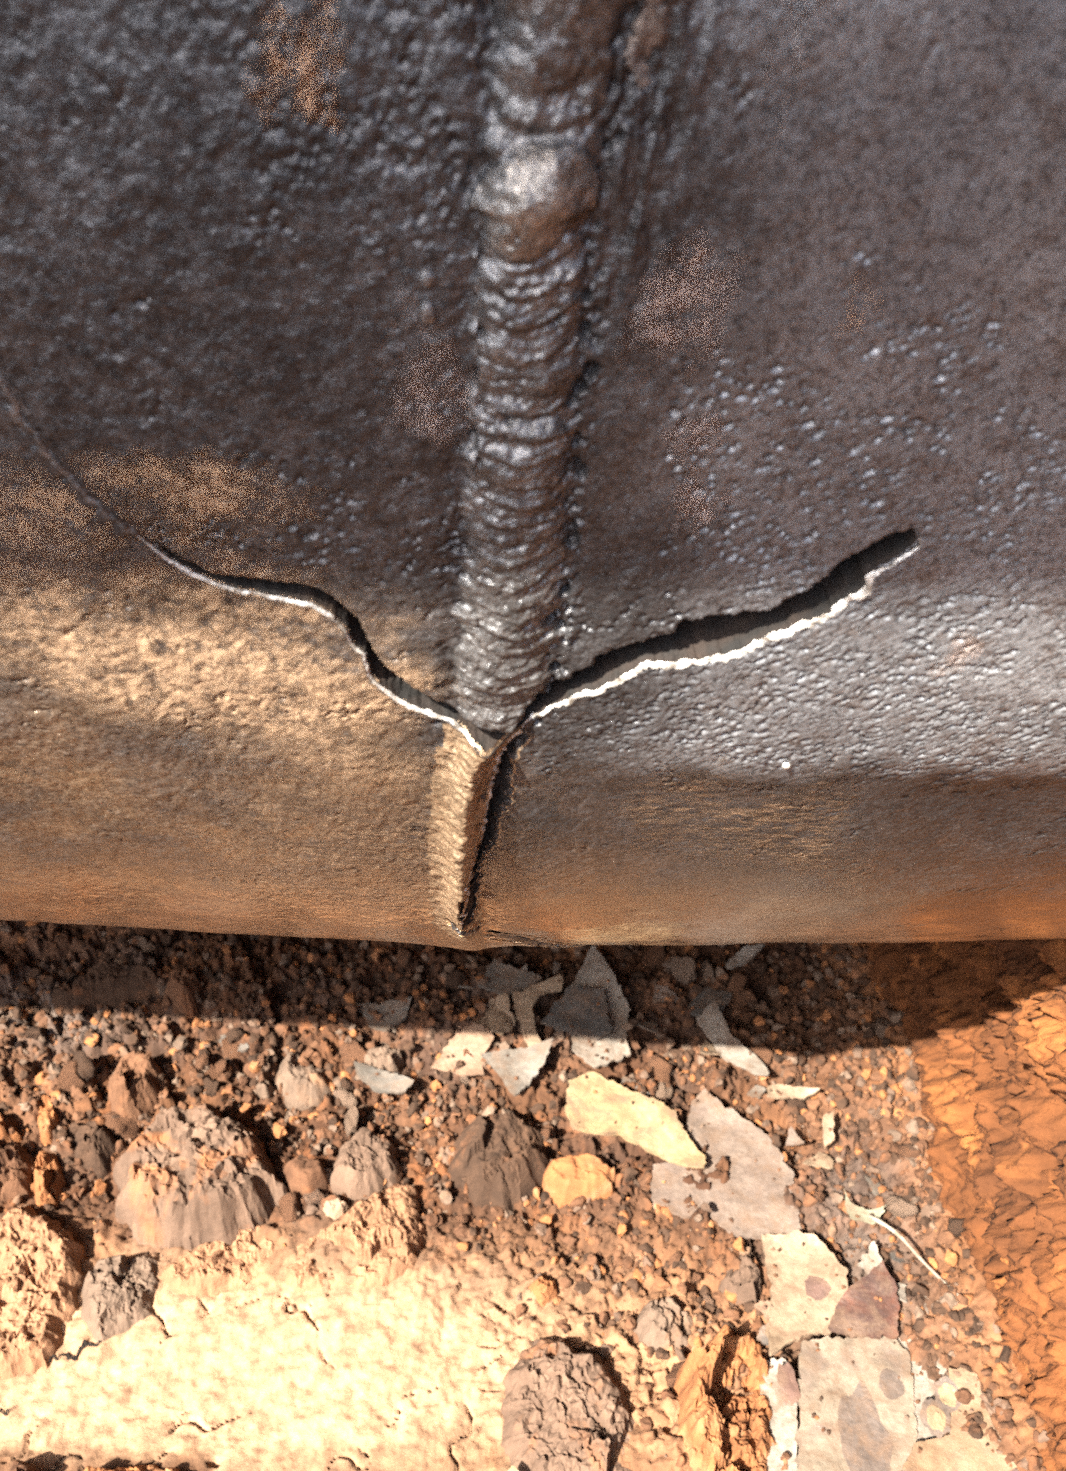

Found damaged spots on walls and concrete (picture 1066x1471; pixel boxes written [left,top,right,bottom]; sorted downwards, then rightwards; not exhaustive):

rust [272,46,316,113]
crack [0,359,924,948]